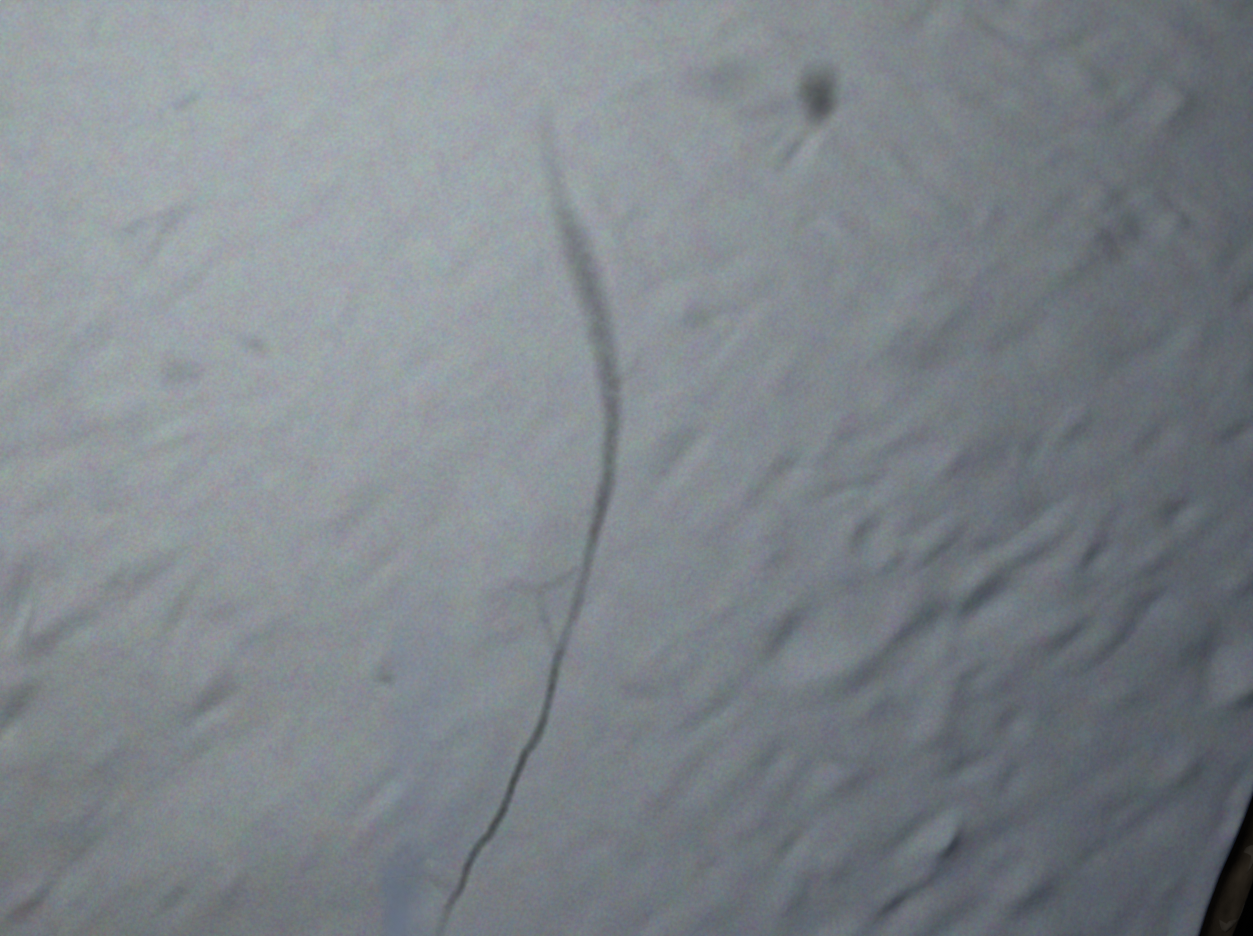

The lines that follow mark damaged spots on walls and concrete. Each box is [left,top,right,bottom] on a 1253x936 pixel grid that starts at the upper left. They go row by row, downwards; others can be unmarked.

crack [571,166,633,300]